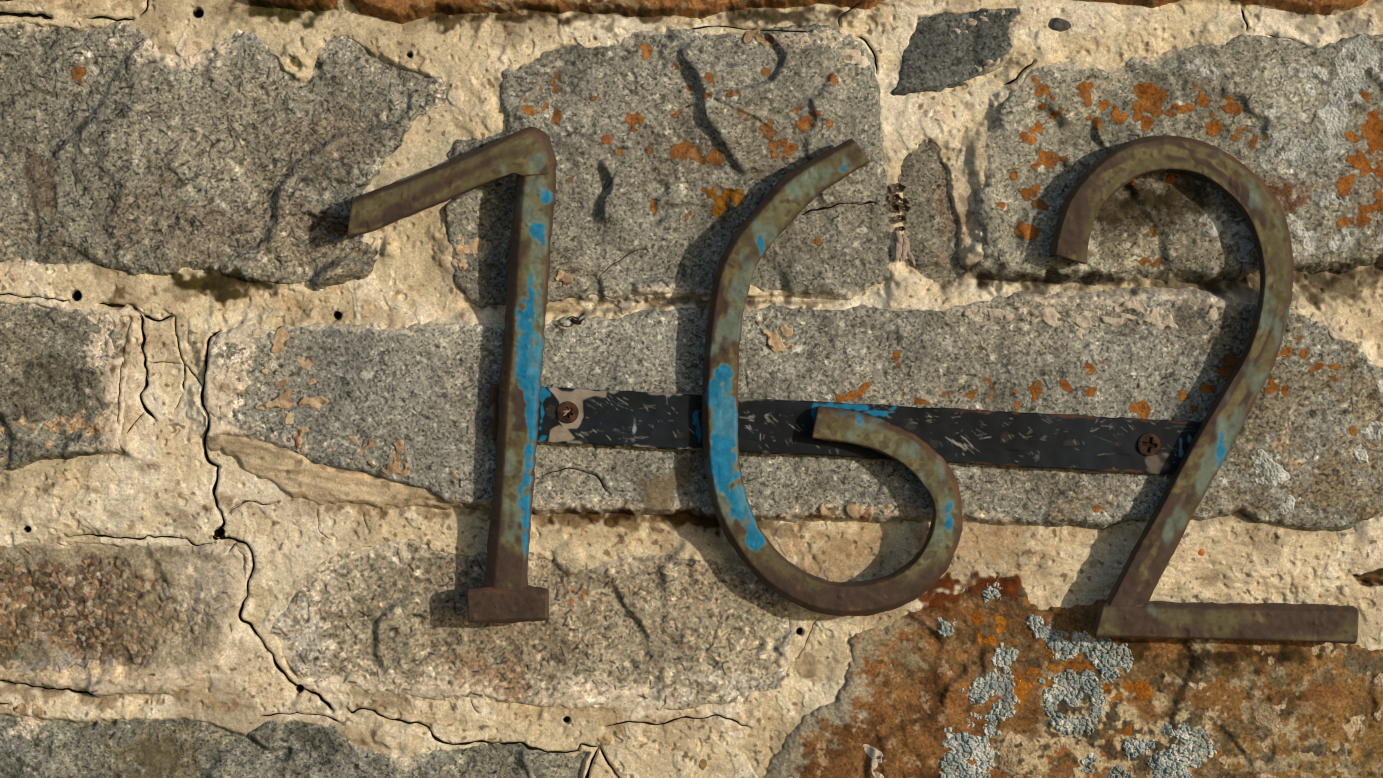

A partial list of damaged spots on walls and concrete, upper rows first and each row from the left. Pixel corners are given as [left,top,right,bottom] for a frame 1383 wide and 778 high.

crack [0,0,149,21]
crack [0,293,750,778]